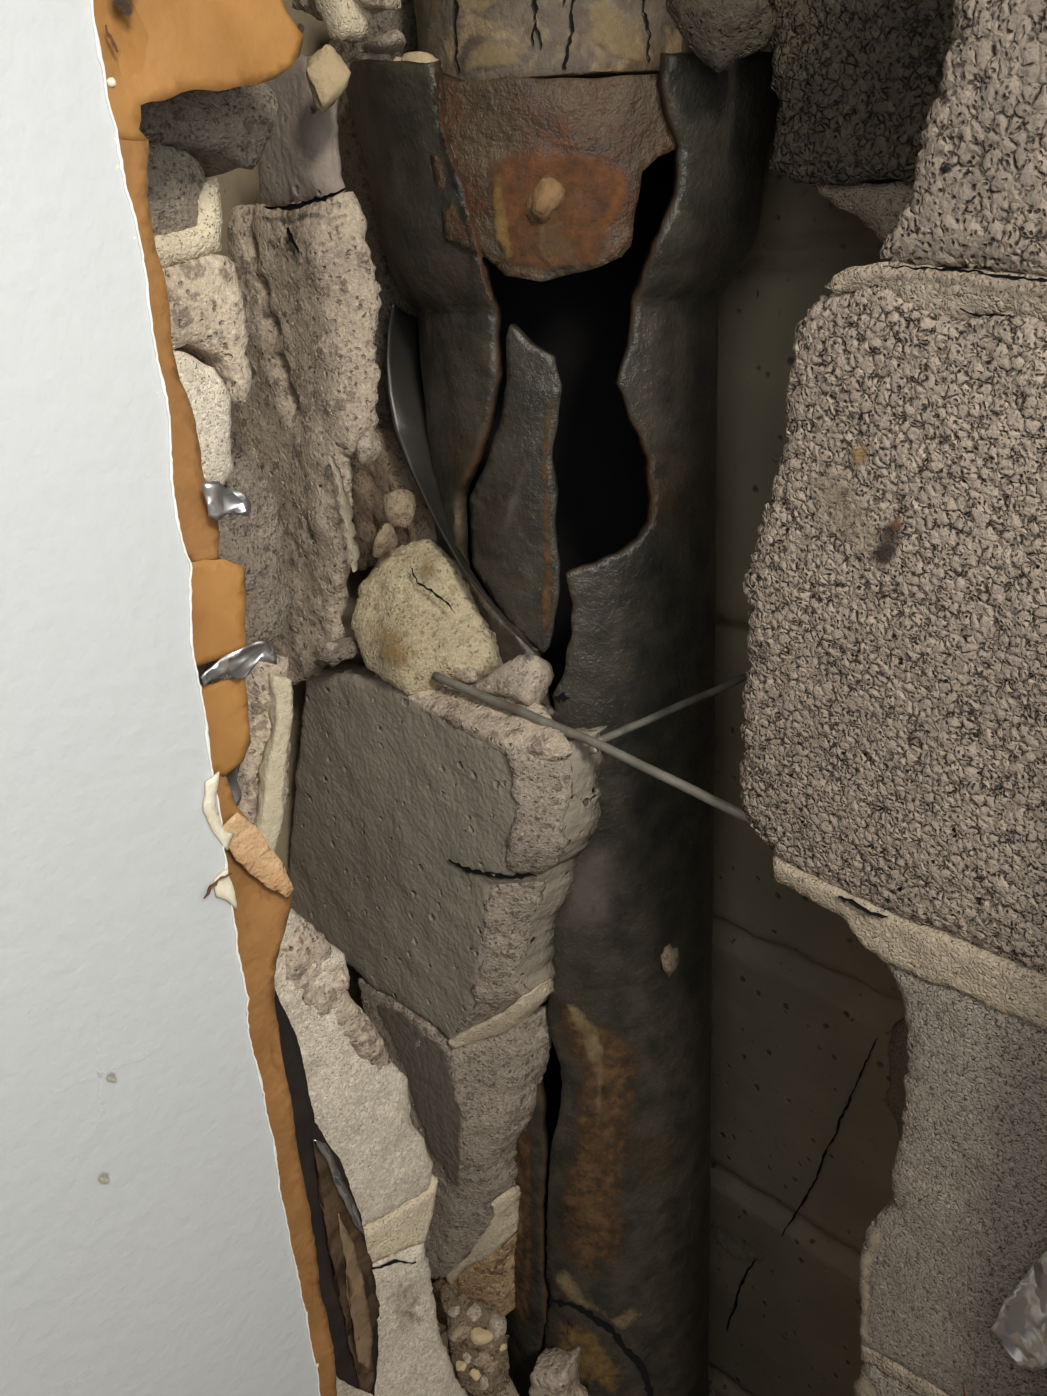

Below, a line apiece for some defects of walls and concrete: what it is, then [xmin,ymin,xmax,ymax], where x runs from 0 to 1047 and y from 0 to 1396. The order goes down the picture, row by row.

rust [490,153,626,268]
spalling [406,682,574,1033]
spalling [281,919,462,1184]
rust [562,1006,636,1270]
crack [781,1038,878,1237]
spalling [884,1017,909,1138]
crack [726,1259,756,1332]